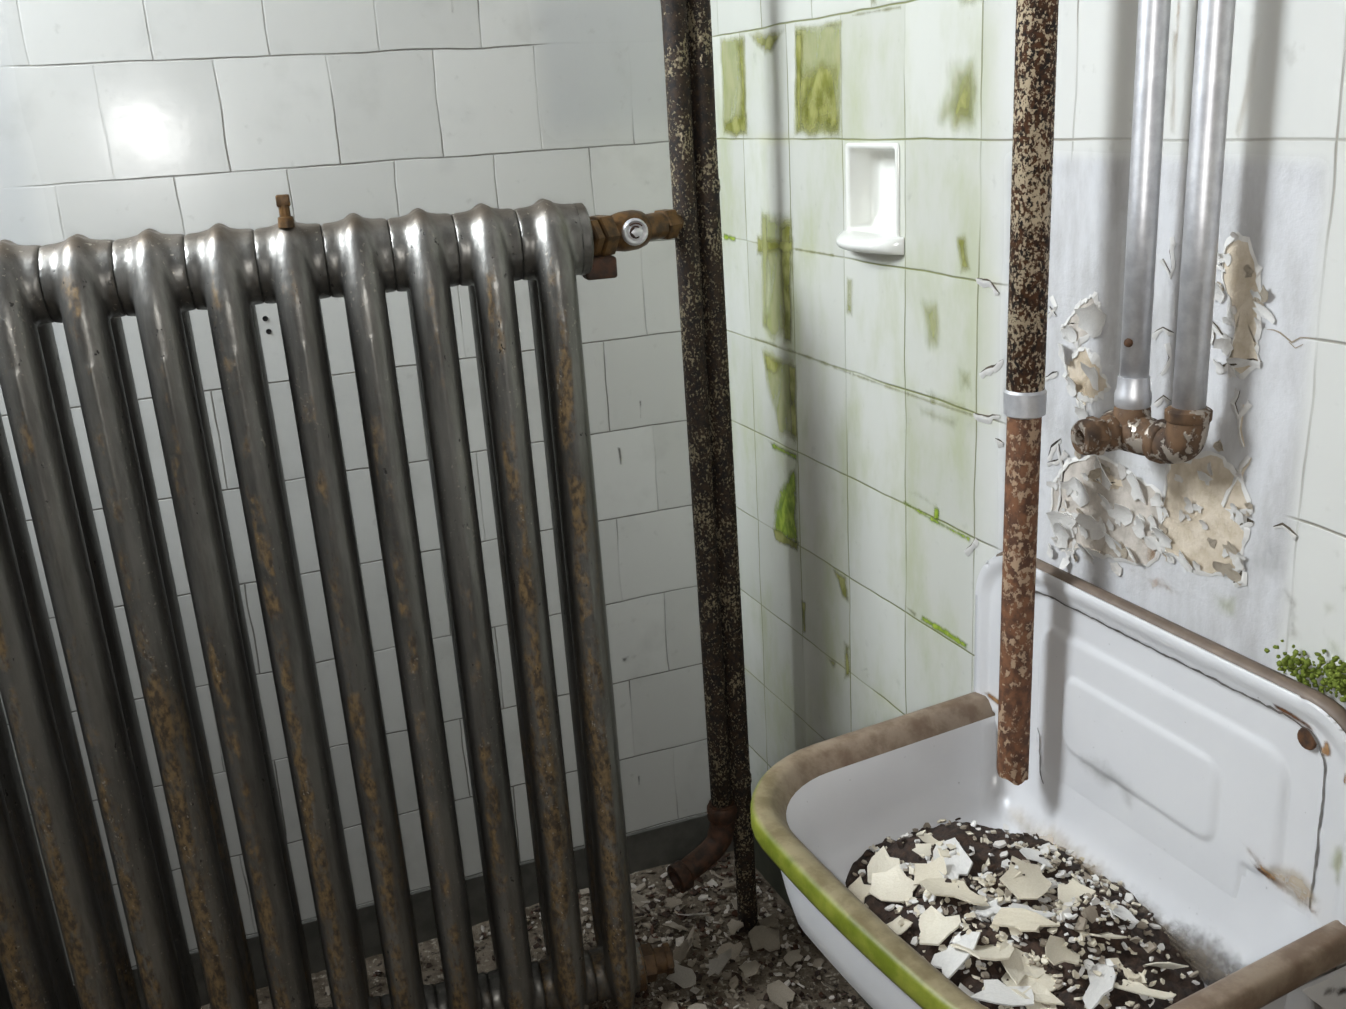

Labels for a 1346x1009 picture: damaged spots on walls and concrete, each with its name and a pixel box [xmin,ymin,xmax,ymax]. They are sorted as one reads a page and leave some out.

peeling [1058,291,1116,420]
peeling [1213,231,1276,379]
peeling [1046,440,1253,586]